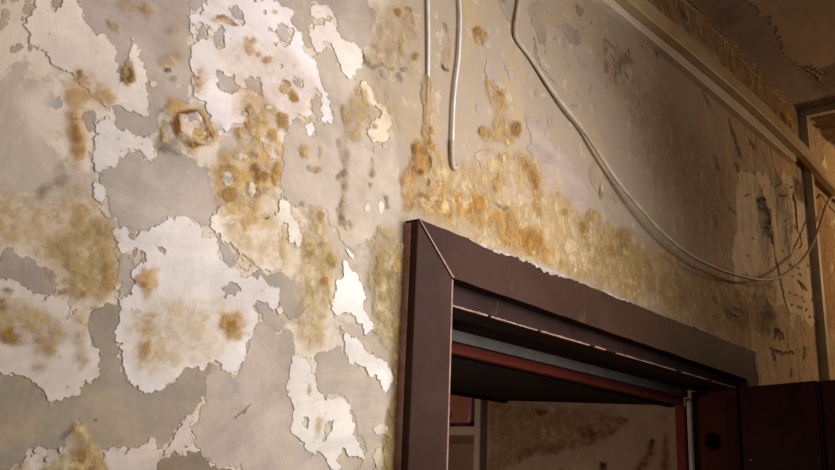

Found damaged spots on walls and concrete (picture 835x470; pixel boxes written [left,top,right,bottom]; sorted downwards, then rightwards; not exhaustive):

flaking render [528,0,585,48]
peeling [741,0,835,69]
peeling [0,0,403,470]
water stain [420,151,775,344]
water stain [370,226,404,470]